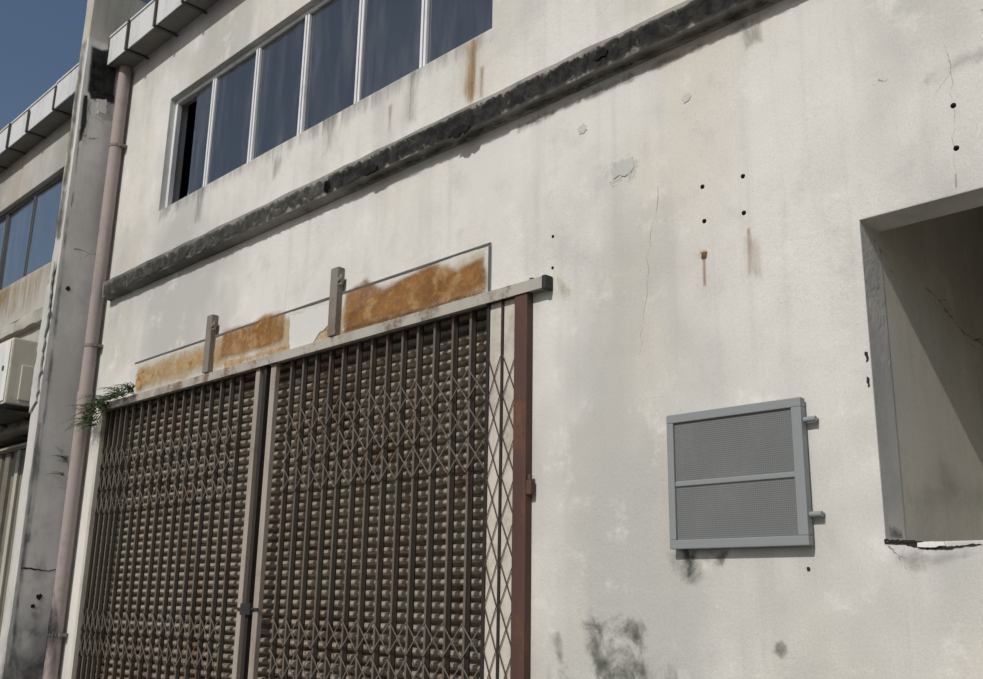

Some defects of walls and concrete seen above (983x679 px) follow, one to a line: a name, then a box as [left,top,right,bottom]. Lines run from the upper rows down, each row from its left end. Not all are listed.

water stain [55,41,116,241]
rust [320,260,486,340]
rust [136,314,290,390]